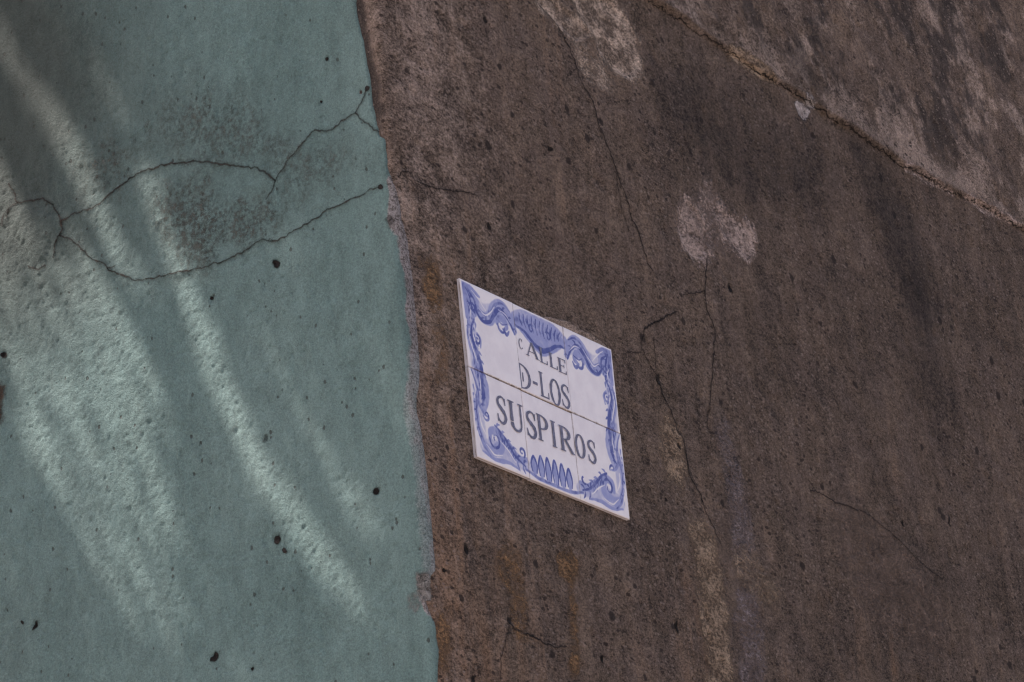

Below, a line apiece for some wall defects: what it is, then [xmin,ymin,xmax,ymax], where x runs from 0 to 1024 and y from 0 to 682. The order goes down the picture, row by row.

crack [1,91,476,281]